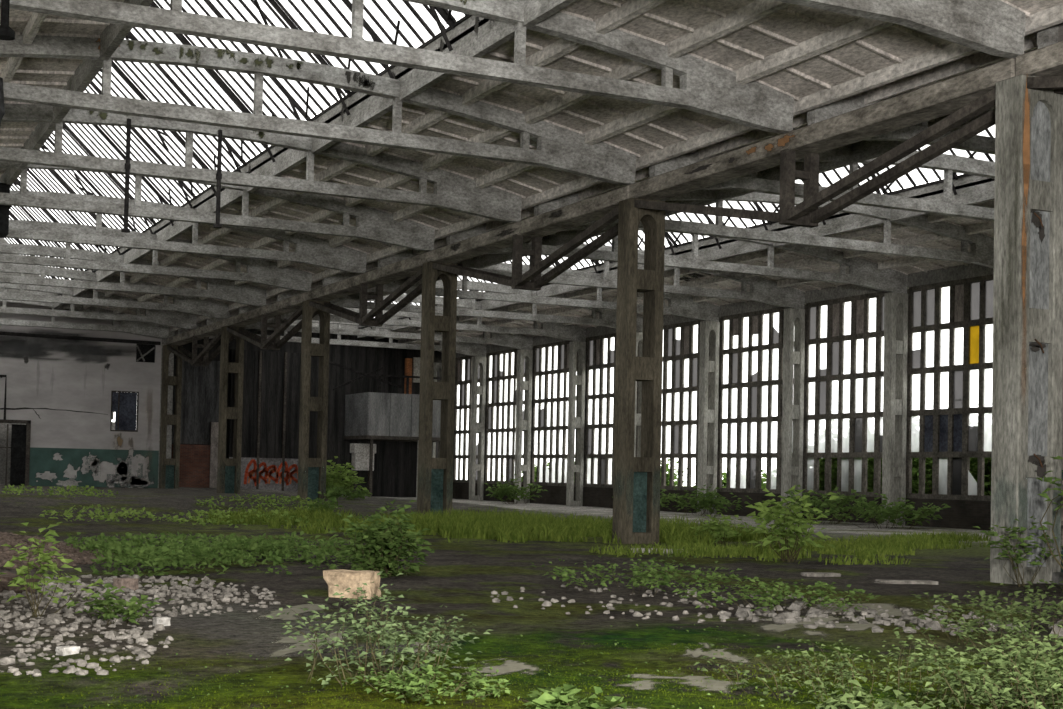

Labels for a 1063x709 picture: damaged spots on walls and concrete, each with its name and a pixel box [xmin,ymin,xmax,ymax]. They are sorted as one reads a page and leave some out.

peeling [36,449,154,488]